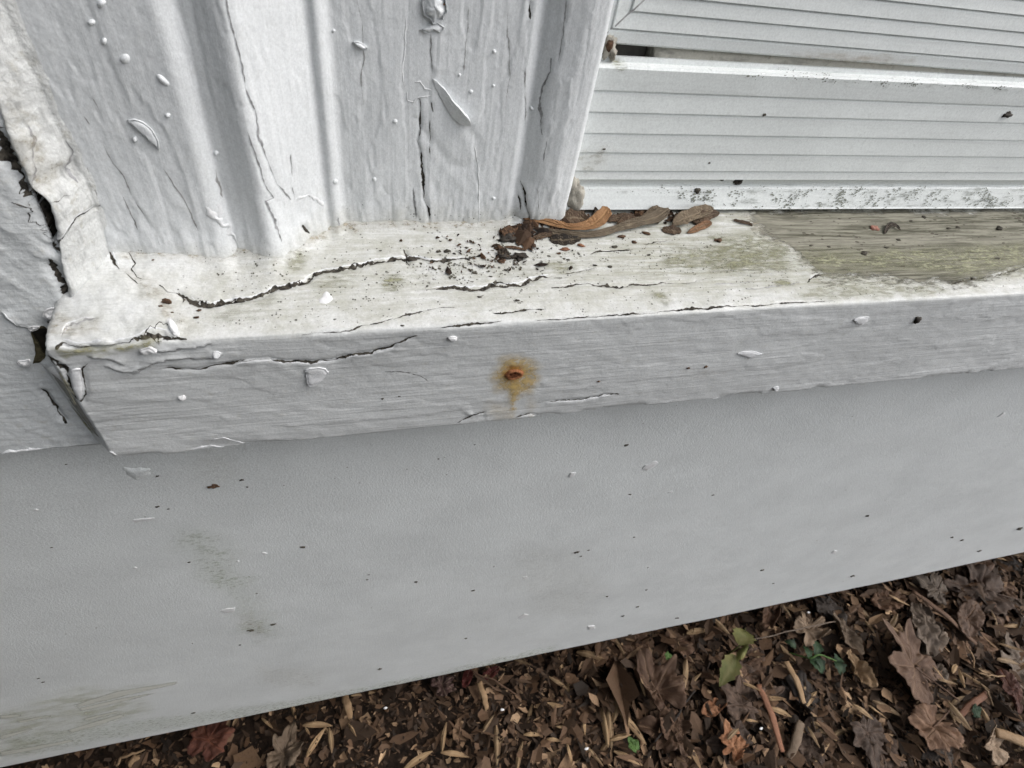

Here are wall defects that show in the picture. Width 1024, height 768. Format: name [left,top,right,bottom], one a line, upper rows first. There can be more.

crack [413,98,433,222]
crack [0,125,878,379]
peeling [749,209,1024,289]
spalling [28,326,47,353]
corrosion [498,359,536,410]